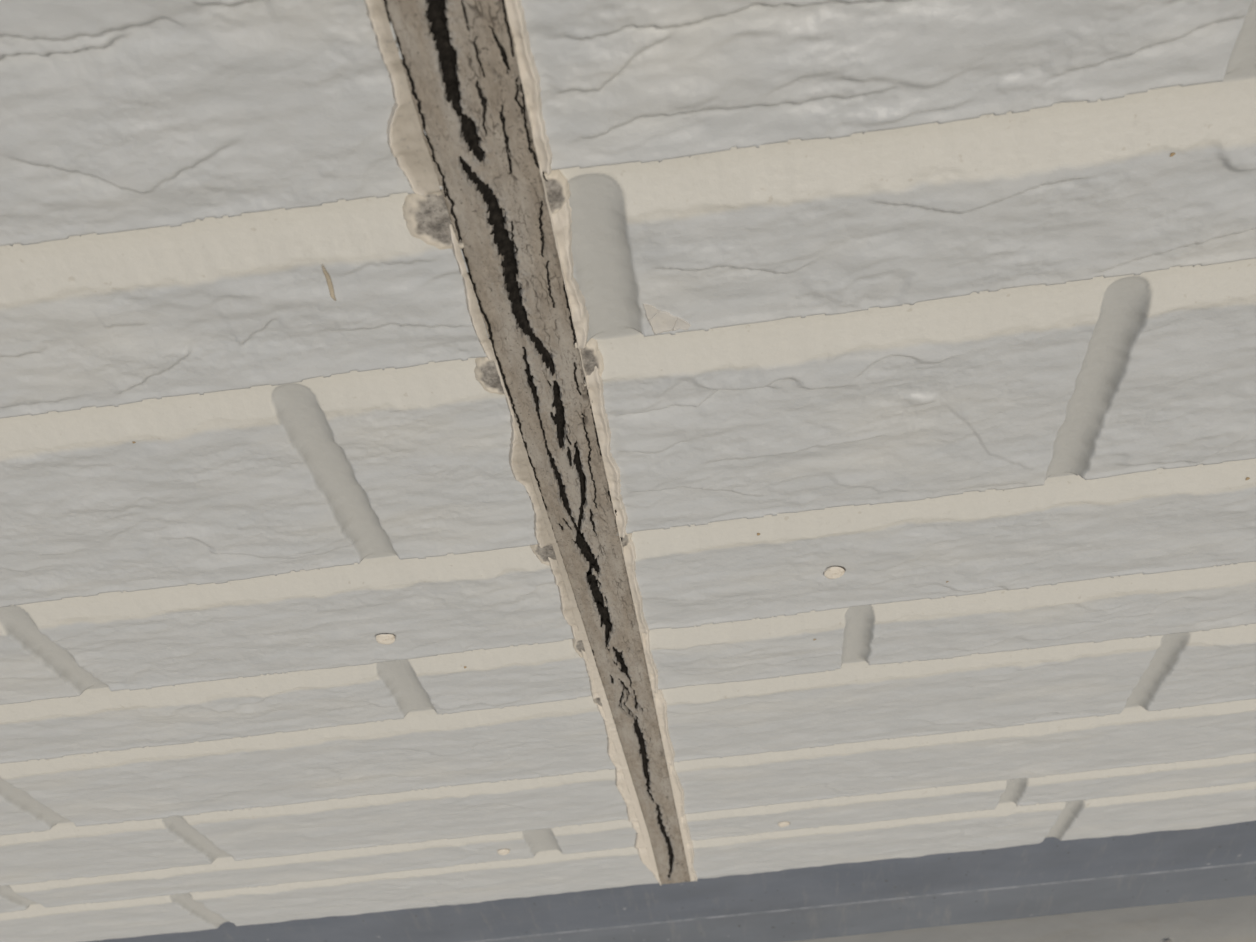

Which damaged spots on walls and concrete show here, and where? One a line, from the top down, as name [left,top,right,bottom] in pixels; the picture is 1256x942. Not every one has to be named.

crack [384,0,674,877]